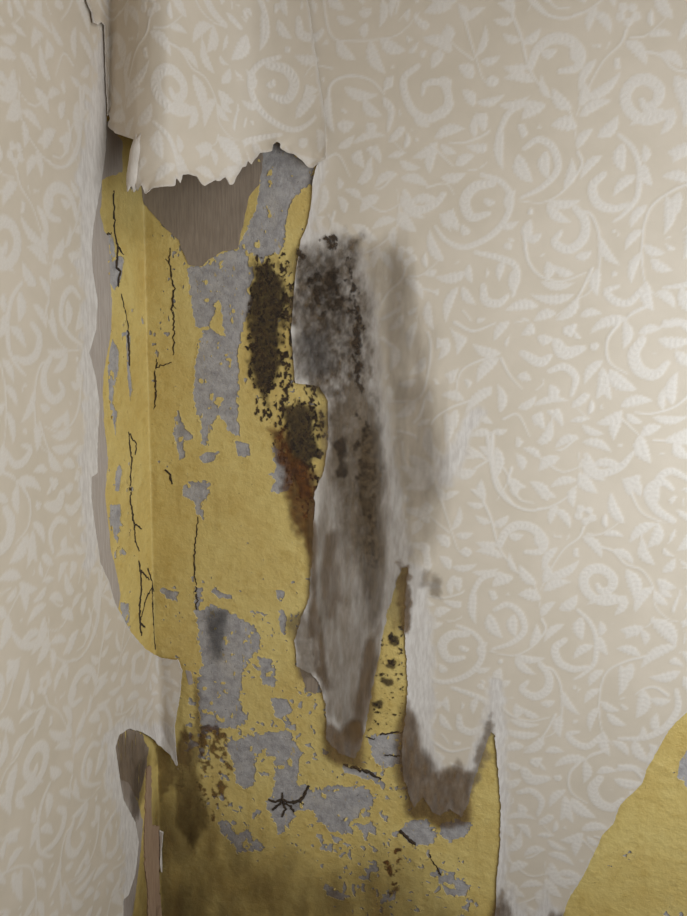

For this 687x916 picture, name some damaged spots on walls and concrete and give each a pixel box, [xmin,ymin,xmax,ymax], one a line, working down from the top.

crack [106,190,131,366]
crack [154,248,176,408]
peeling [86,0,326,463]
crack [128,432,156,650]
peeling [182,480,211,520]
peeling [268,445,287,494]
damp [245,234,492,827]
damp [157,725,233,849]
crack [268,785,309,818]
peeling [193,586,399,840]
peeling [400,819,473,847]
peeling [438,872,471,898]